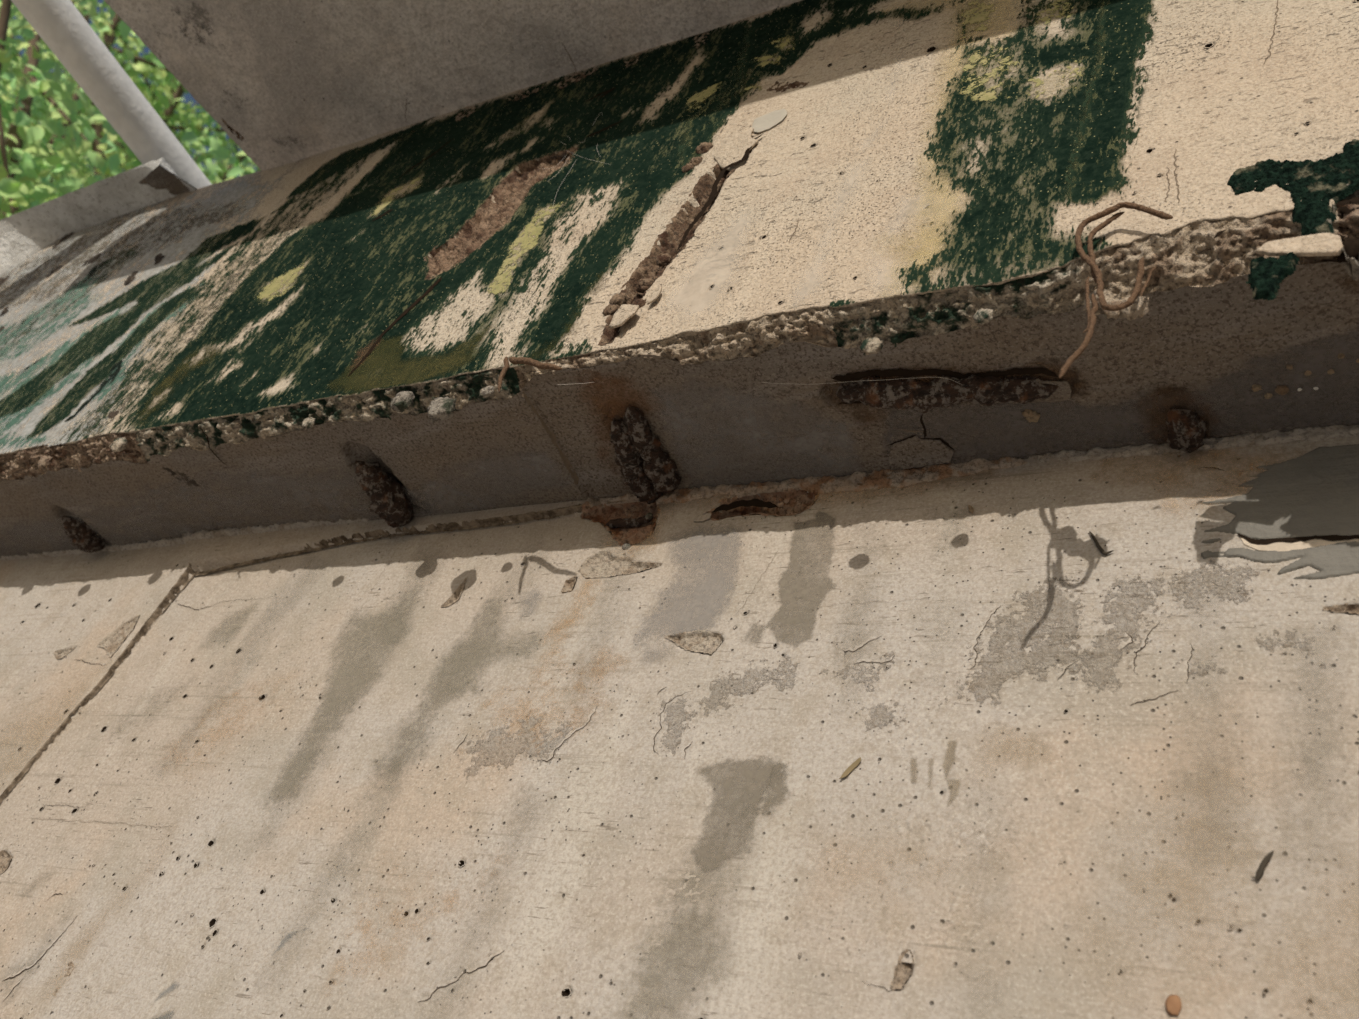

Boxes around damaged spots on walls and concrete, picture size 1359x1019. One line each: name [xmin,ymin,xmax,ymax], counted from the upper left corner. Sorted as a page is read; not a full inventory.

spalling [1298,184,1359,281]
corrosion [62,516,106,553]
corrosion [355,461,414,528]
corrosion [610,407,682,504]
spalling [0,210,1302,487]
water stain [649,529,740,634]
water stain [768,512,834,645]
corrosion [832,361,1084,423]
corrosion [1165,409,1208,453]
spalling [665,630,723,654]
water stain [275,616,406,797]
water stain [689,759,786,883]